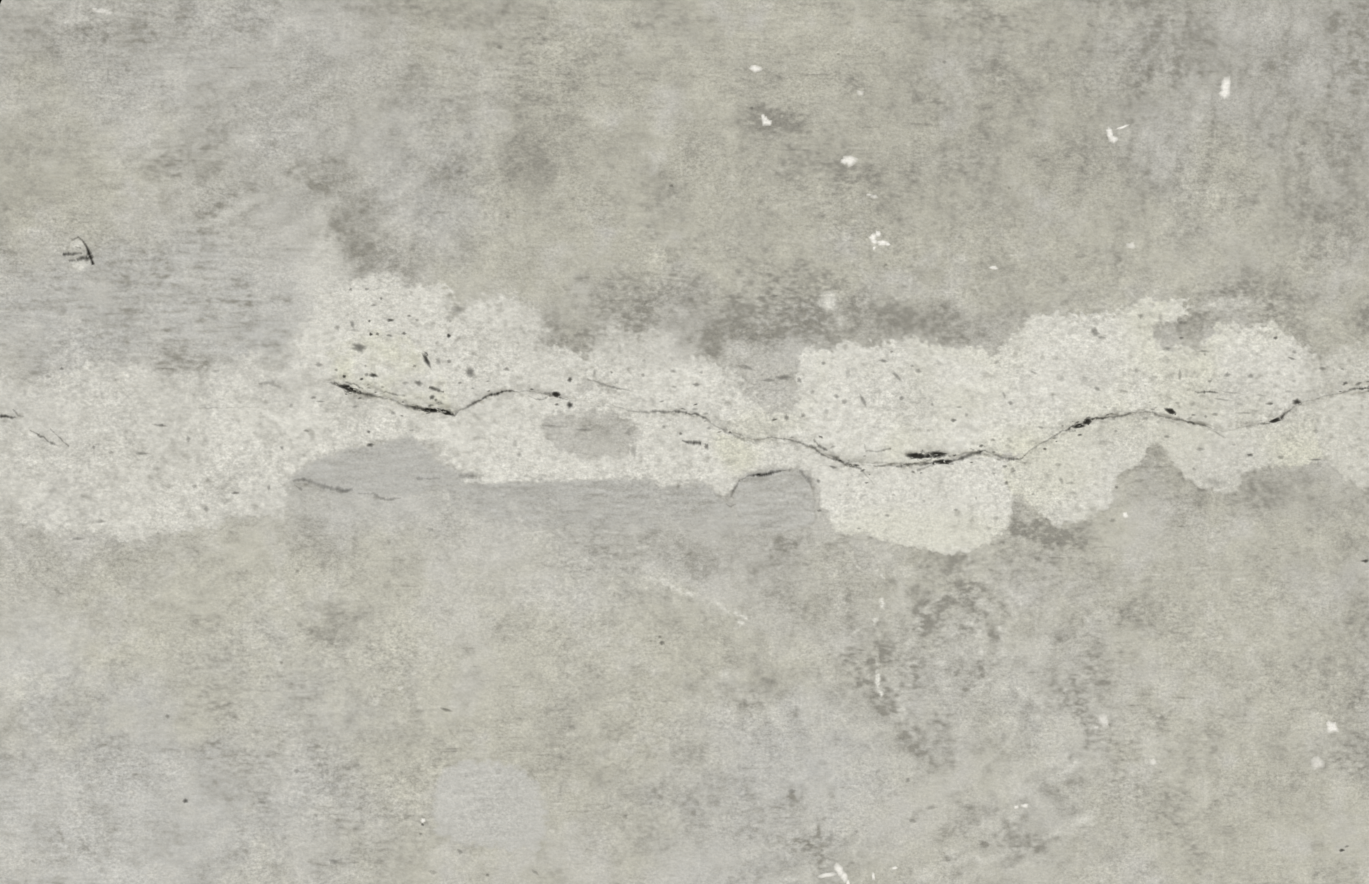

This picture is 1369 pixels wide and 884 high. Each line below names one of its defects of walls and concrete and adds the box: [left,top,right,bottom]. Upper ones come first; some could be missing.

spalling [0,279,1369,558]
crack [326,378,1369,508]